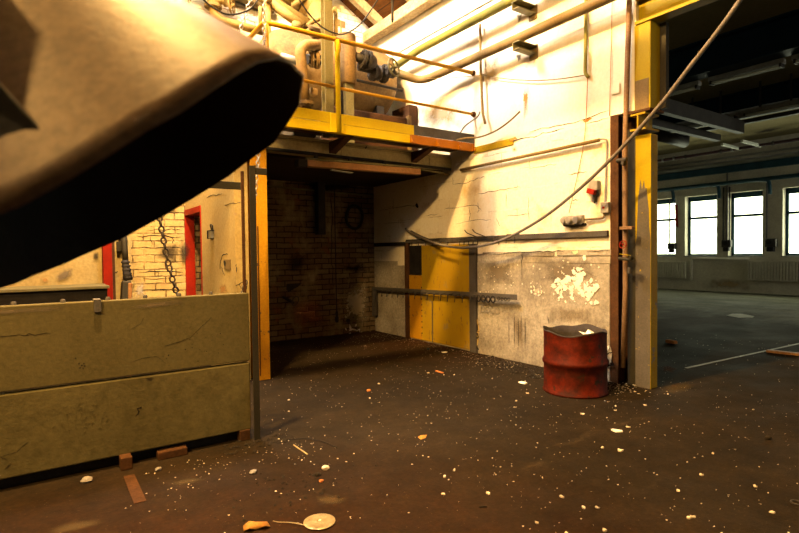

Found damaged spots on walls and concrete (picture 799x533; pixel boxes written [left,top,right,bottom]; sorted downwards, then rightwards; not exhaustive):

peeling [493,255,600,305]